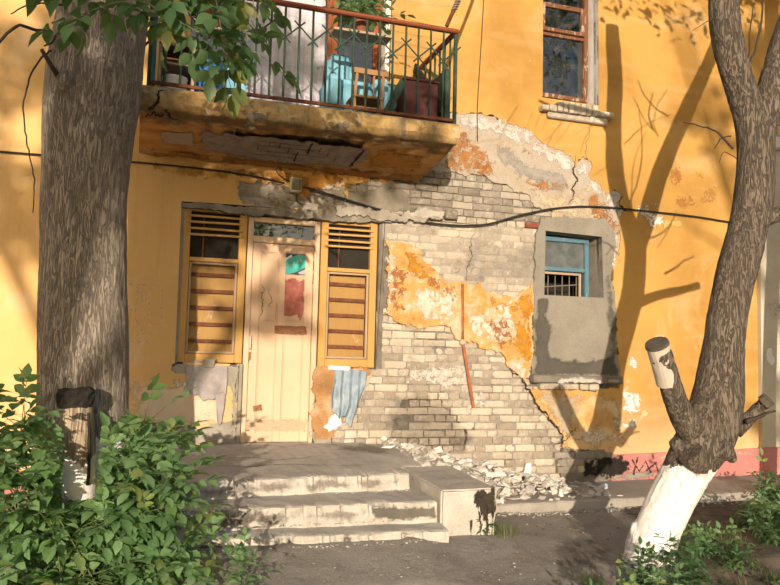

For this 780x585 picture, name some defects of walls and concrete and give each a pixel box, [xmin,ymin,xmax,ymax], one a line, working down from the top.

crack [146,89,177,120]
spalling [160,110,370,169]
peeling [638,202,683,228]
flaking render [237,112,624,482]
rust [459,339,475,408]
peeling [131,379,228,426]
peeling [608,380,648,430]